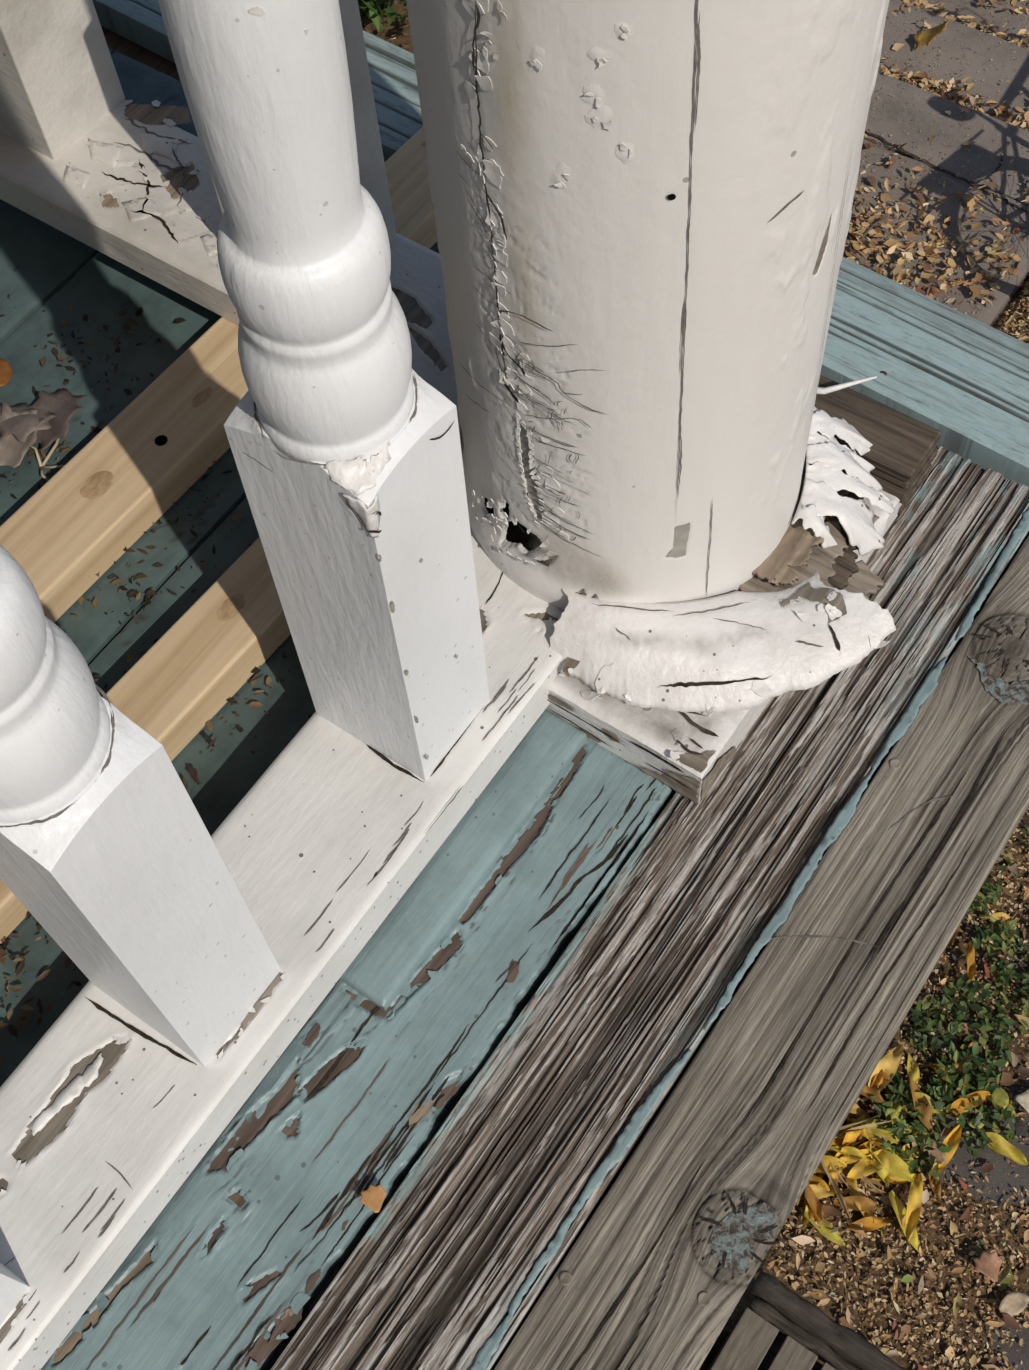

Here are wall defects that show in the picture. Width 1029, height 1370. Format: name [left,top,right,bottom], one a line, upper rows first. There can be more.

crack [103,117,194,244]
peeling [470,136,557,567]
crack [430,2,608,557]
crack [595,498,765,640]
crack [676,0,701,508]
crack [796,640,824,648]
peeling [799,407,895,556]
peeling [345,663,619,1021]
peeling [705,657,948,1031]
peeling [0,1035,130,1197]
peeling [207,1034,379,1172]
peeling [469,1050,691,1370]